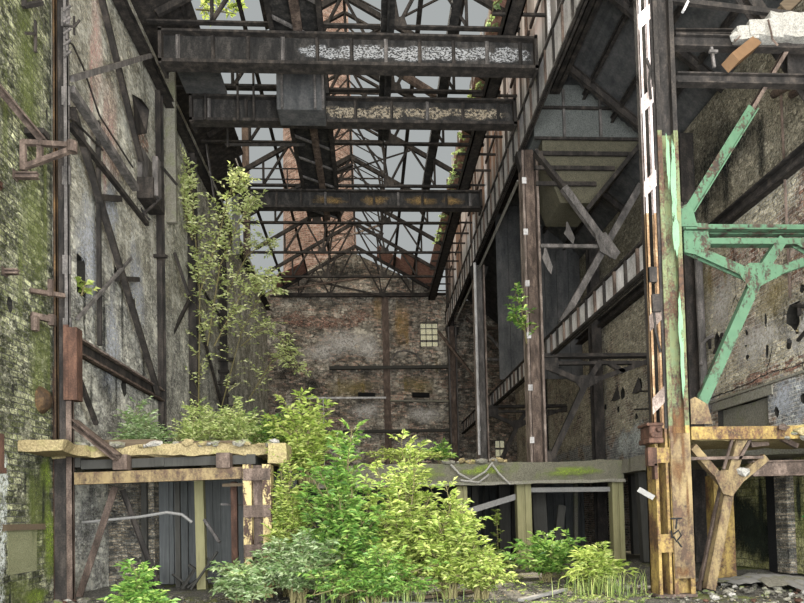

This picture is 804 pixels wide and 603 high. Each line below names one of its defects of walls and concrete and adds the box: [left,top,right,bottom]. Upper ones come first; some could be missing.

peeling [666,135,680,256]
spalling [789,169,804,224]
spalling [723,248,769,265]
spalling [782,248,804,289]
flaking render [734,298,804,414]
corrosion [673,411,689,514]